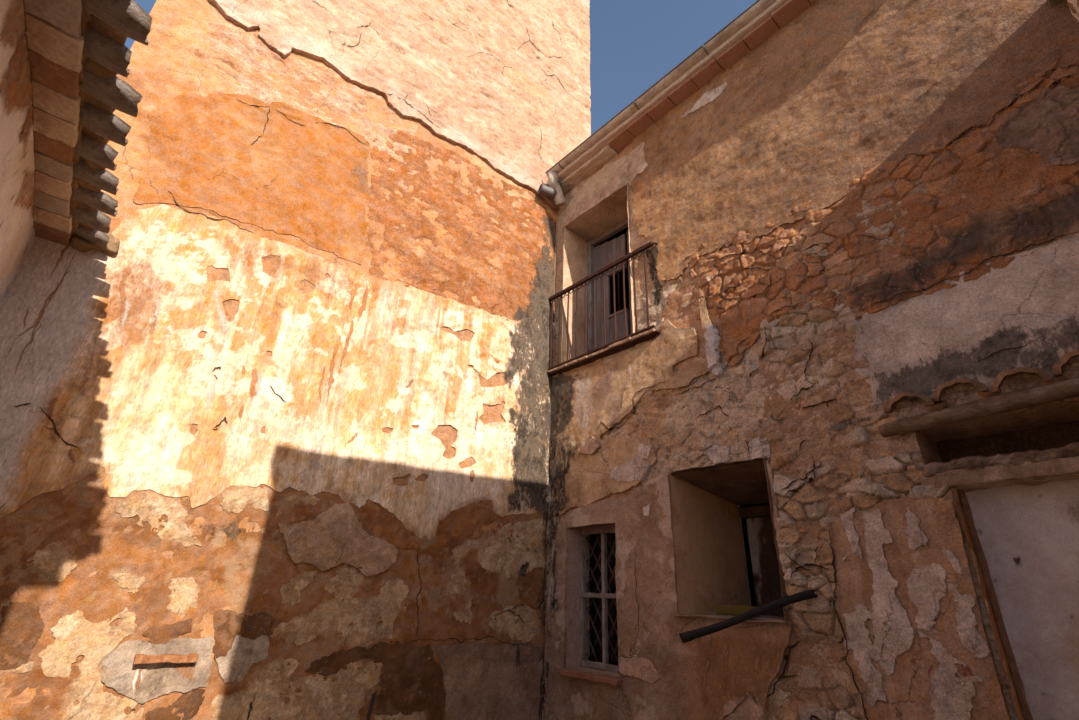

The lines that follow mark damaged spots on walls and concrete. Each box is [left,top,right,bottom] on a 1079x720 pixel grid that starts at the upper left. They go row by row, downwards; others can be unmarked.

crack [169,191,255,234]
crack [239,100,365,145]
spalling [194,22,648,318]
crack [0,403,81,452]
spalling [222,299,239,322]
water stain [504,214,639,635]
peeling [609,444,656,483]
crack [593,243,836,452]
spalling [663,49,1079,720]
water stain [874,315,1079,407]
spalling [0,467,548,720]
crack [784,529,869,720]